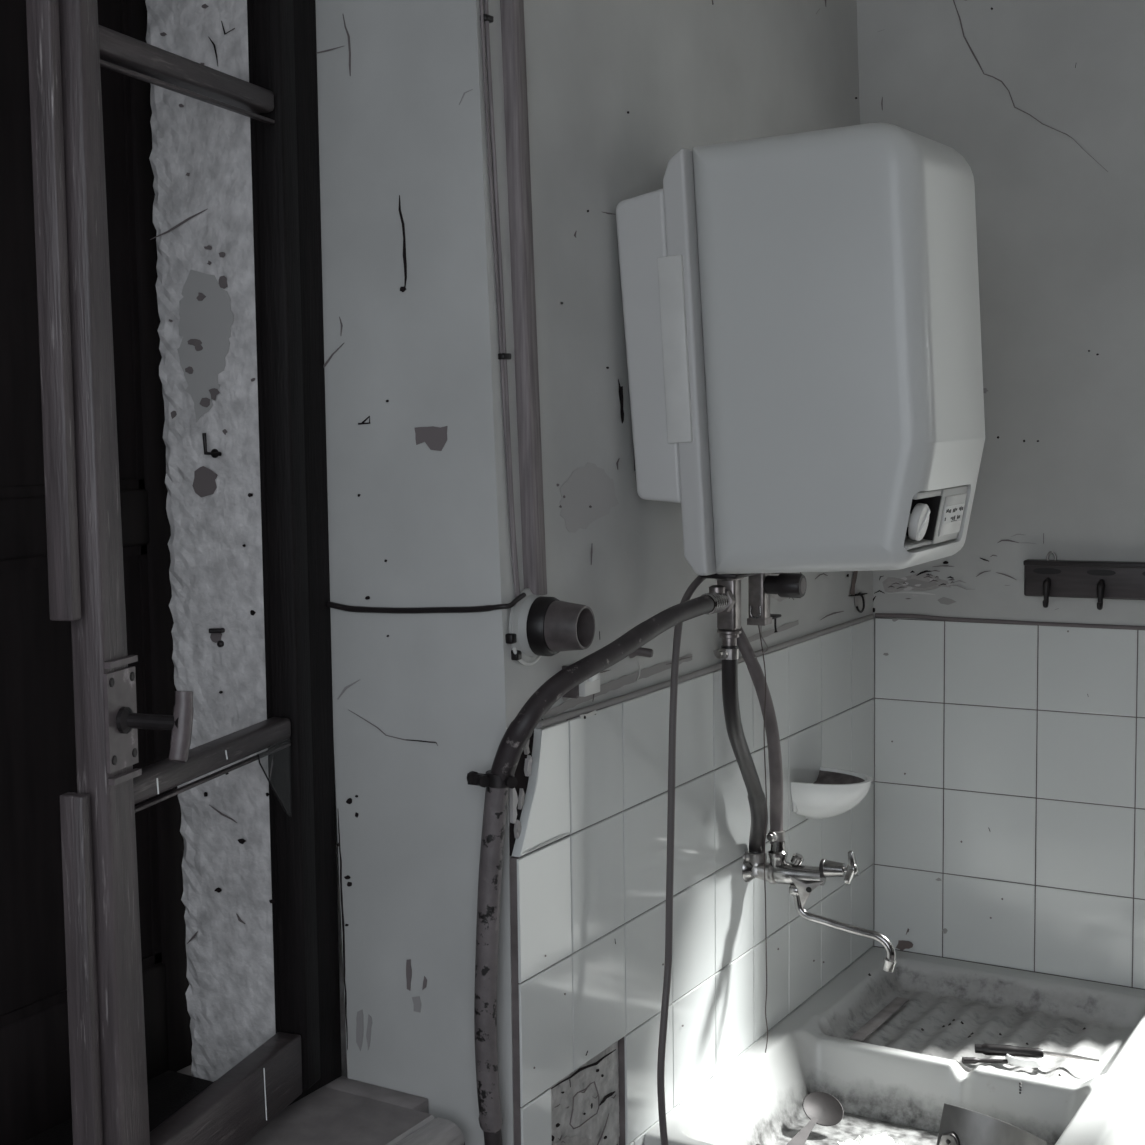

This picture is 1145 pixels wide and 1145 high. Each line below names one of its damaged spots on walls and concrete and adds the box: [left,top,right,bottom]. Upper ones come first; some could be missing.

crack [953,0,1108,172]
peeling [882,561,954,599]
crack [349,710,438,746]
peeling [550,1041,620,1145]